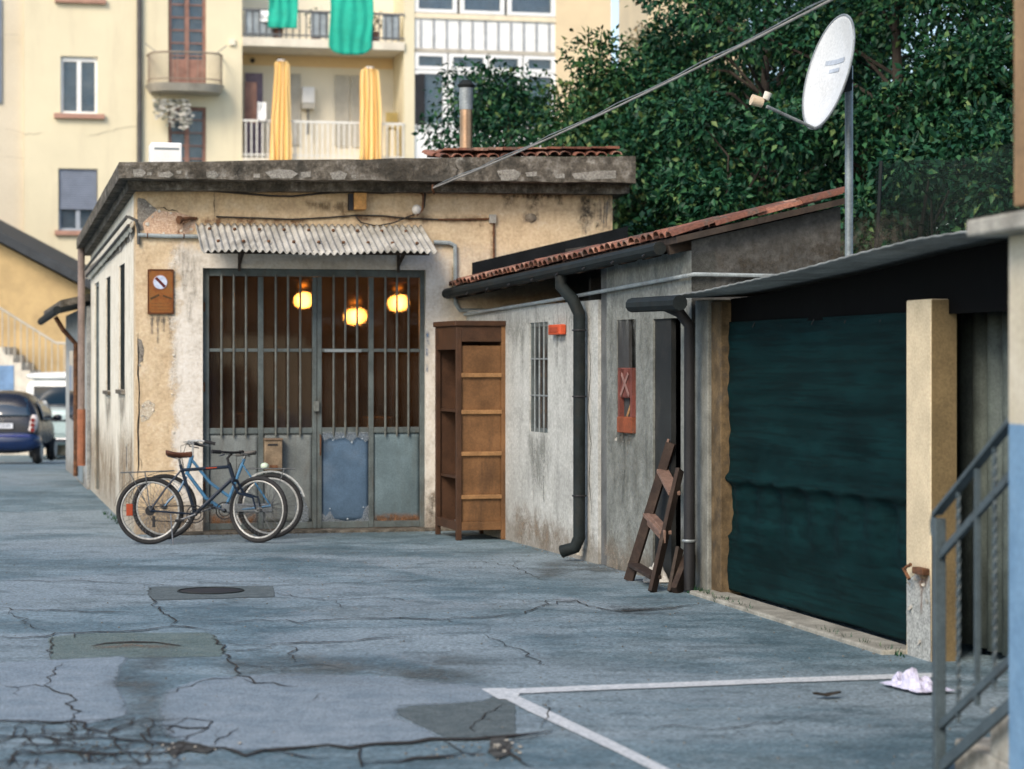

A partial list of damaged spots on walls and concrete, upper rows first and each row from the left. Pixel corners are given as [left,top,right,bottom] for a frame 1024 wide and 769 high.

peeling [85,198,196,279]
crack [0,561,716,769]